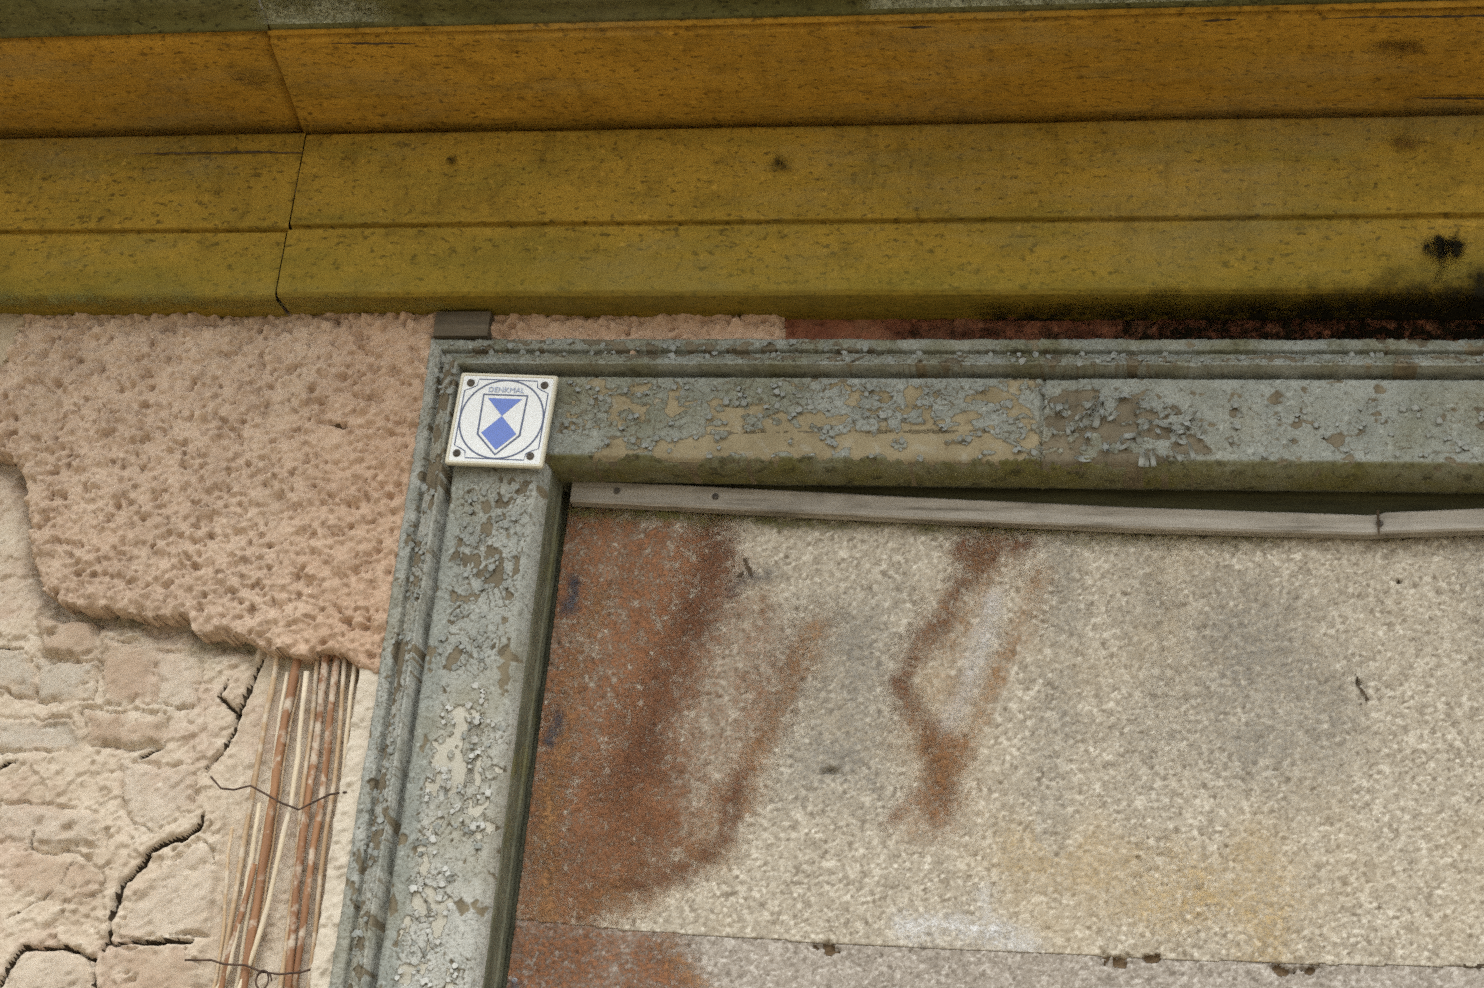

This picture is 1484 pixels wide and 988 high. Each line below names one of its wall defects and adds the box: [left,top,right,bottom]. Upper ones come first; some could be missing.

damp [907,234,1484,341]
peeling [564,349,1314,467]
peeling [1228,400,1469,463]
flaking render [0,462,413,988]
crack [217,659,264,750]
corrosion [506,499,775,988]
peeling [395,337,971,988]
corrosion [892,536,1031,821]
crack [0,815,205,988]
spalling [1102,954,1162,968]
spalling [1272,964,1315,977]